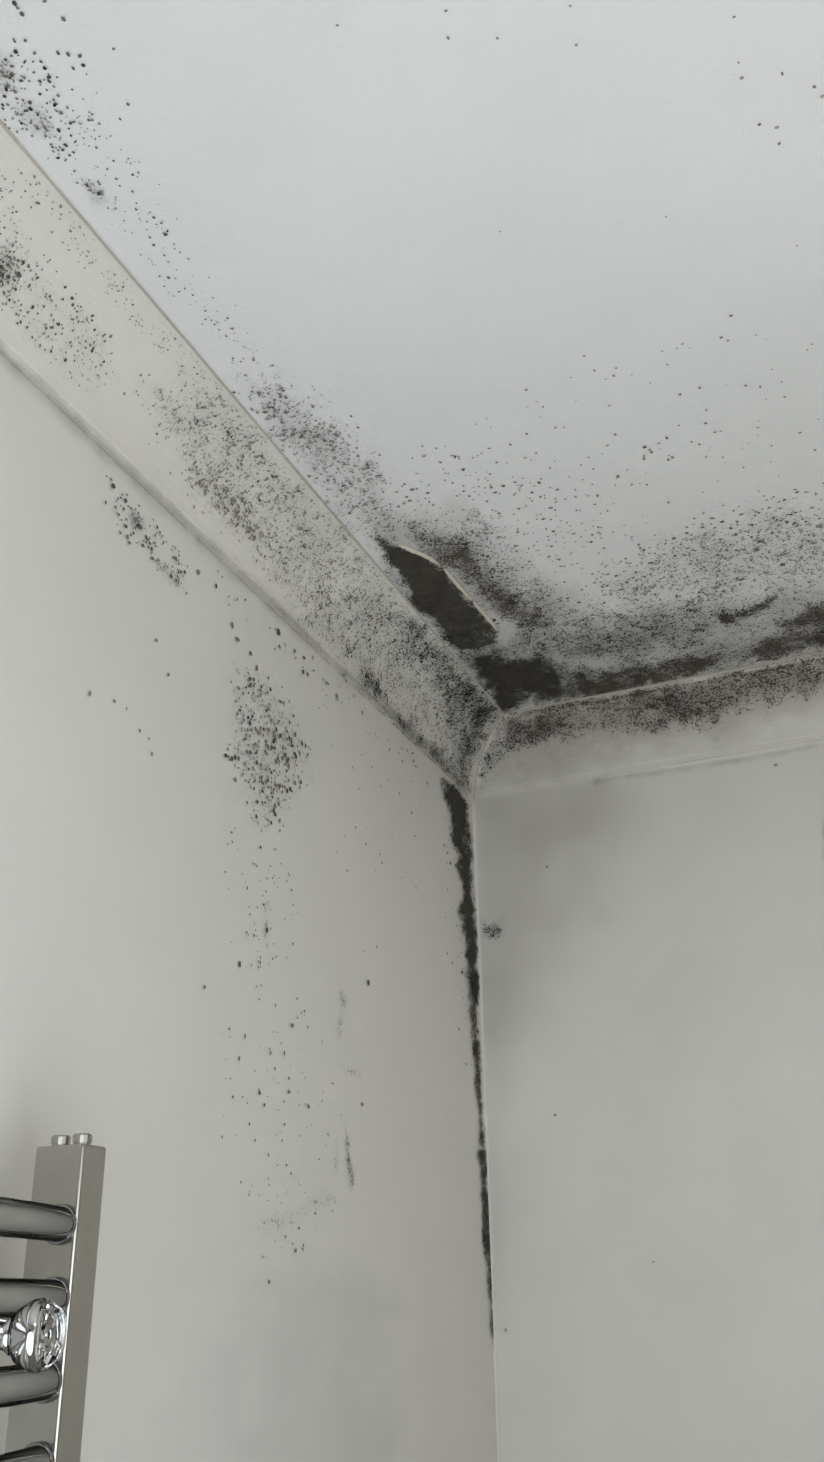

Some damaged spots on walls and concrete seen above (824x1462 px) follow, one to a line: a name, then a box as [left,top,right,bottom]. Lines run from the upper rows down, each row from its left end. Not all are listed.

damp [0,38,194,305]
peeling [375,536,500,667]
damp [0,169,824,1338]